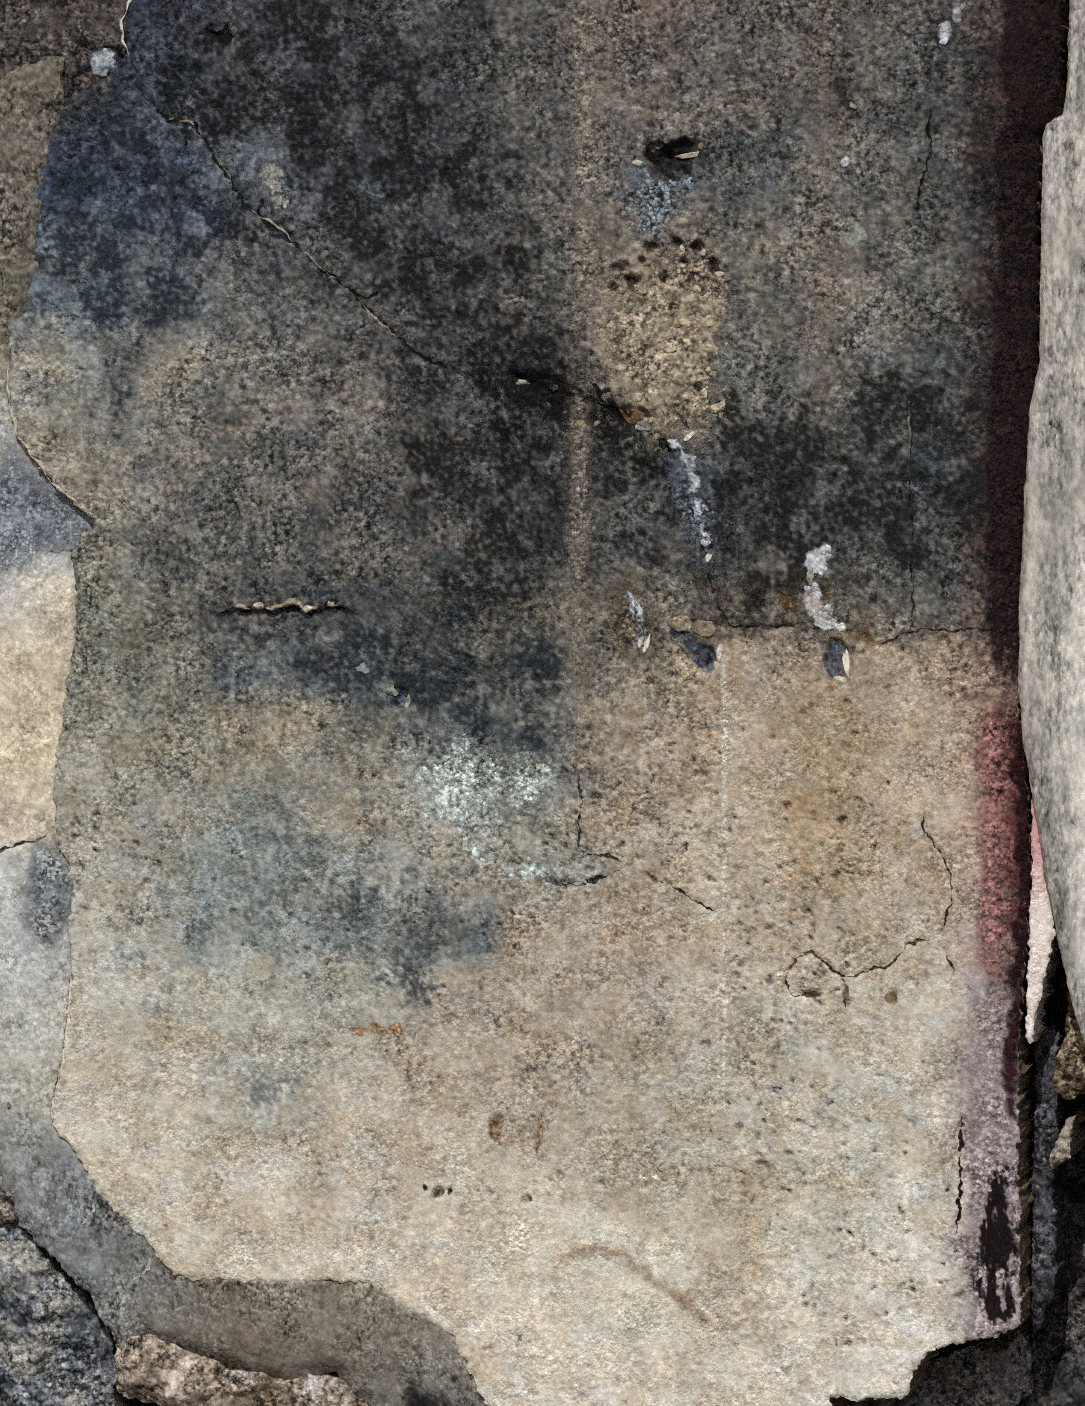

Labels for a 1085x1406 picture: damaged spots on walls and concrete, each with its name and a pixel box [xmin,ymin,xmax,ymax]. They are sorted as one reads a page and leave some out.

crack [138,88,468,378]
water stain [28,0,1023,882]
spalling [593,236,729,563]
crack [219,598,354,616]
water stain [714,665,729,1170]
water stain [763,784,809,1010]
crack [785,813,955,1008]